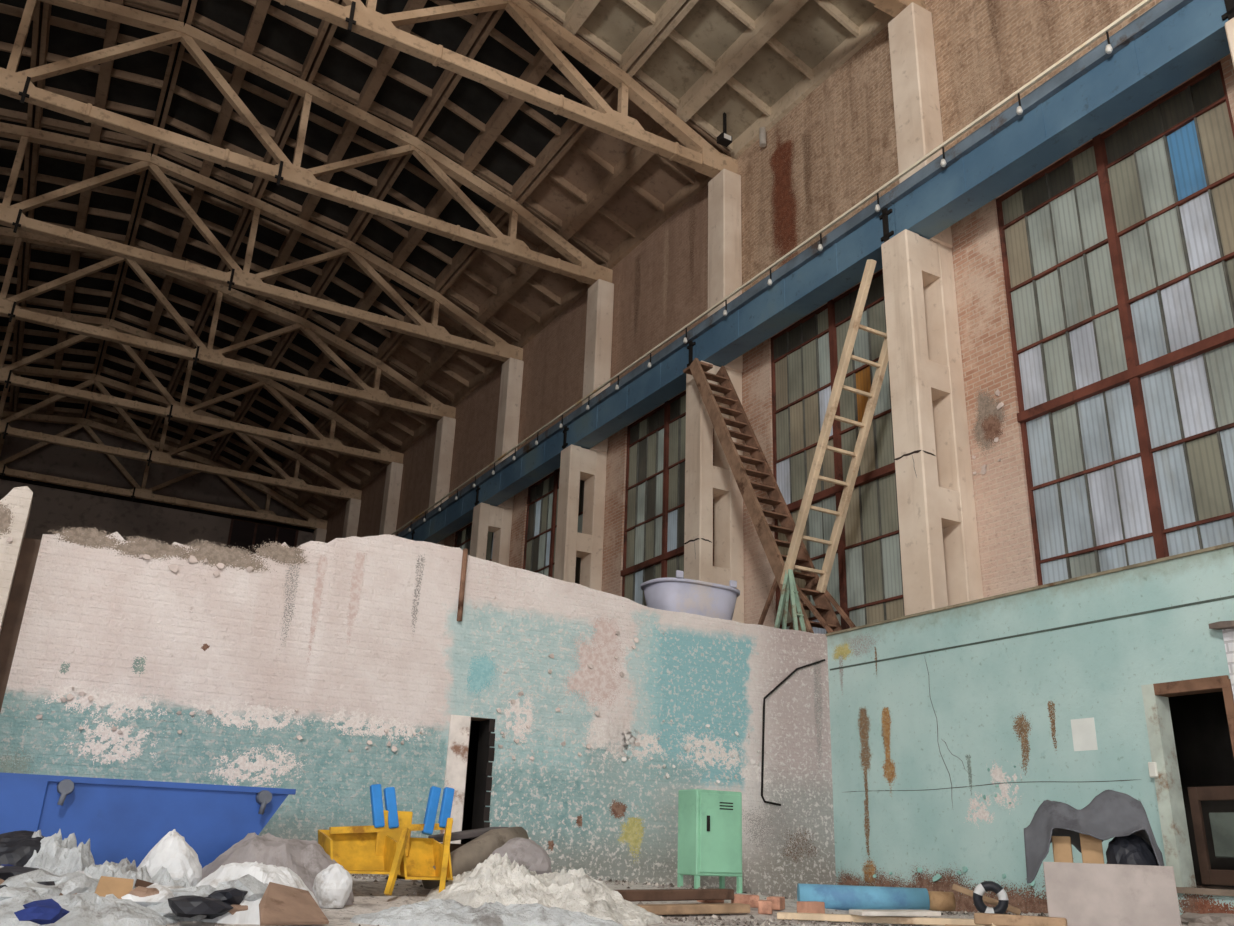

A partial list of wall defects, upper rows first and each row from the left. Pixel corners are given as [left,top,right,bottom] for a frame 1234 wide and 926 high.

water stain [768,124,814,268]
peeling [24,682,439,788]
rust [857,706,897,886]
crack [851,656,1056,806]
rust [1011,712,1033,777]
rust [1047,701,1057,751]